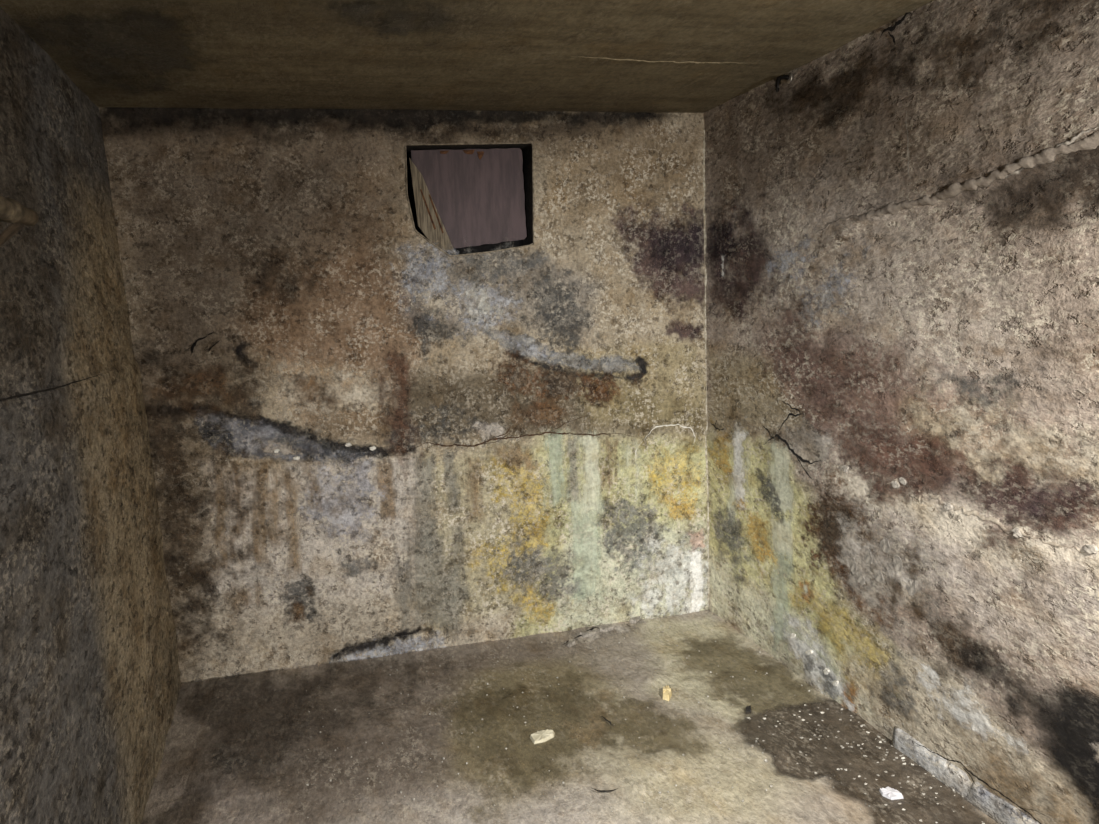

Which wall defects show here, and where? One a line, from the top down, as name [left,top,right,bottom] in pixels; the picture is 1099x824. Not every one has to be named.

crack [0,374,100,402]
water stain [765,238,1099,530]
water stain [385,359,1027,754]
water stain [178,666,379,778]
water stain [461,675,706,784]
water stain [681,638,996,824]
water stain [976,659,1099,824]